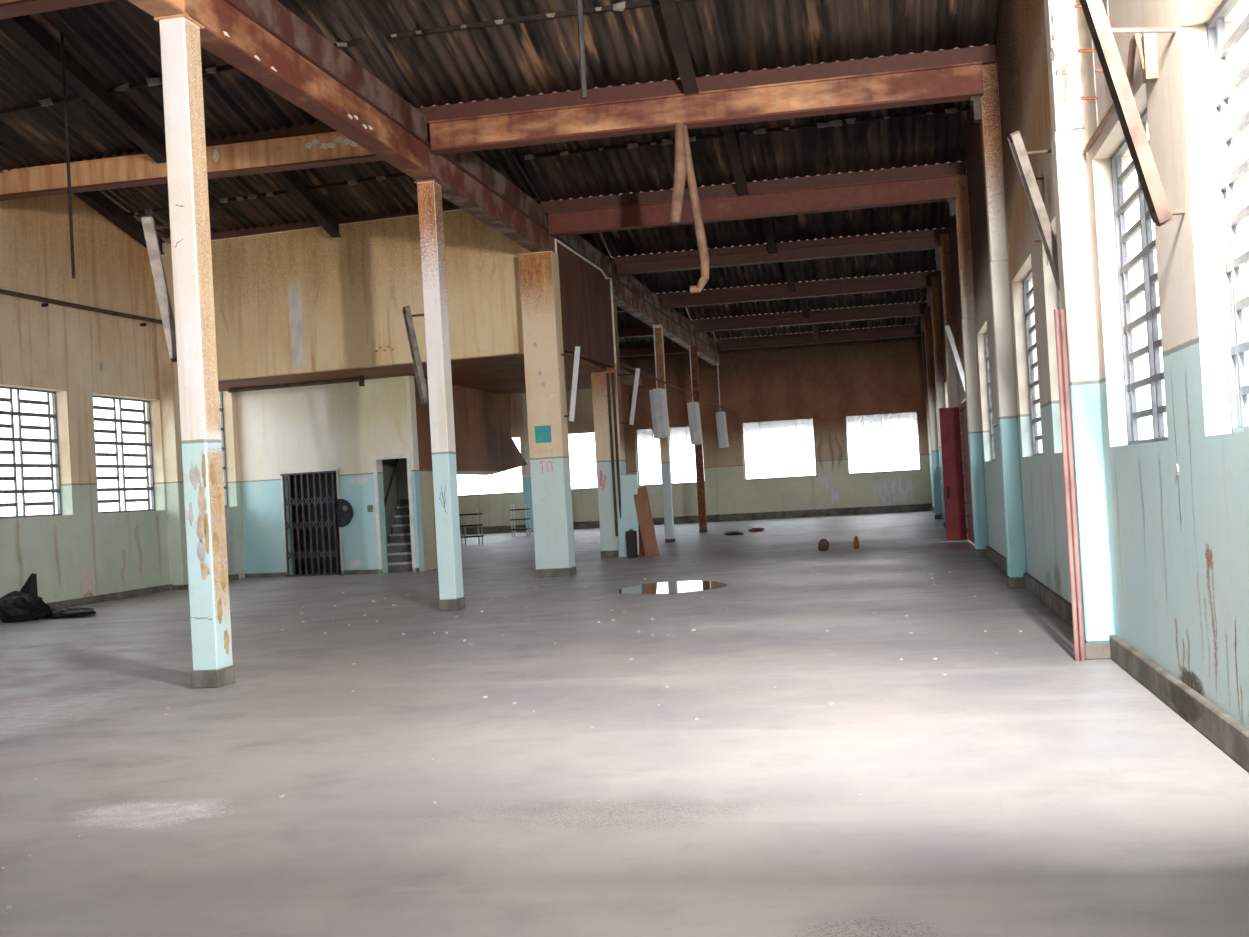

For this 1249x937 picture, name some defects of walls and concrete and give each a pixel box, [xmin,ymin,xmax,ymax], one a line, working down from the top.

peeling [188,451,210,580]
leakage [1158,454,1208,724]
corrosion [1197,544,1243,723]